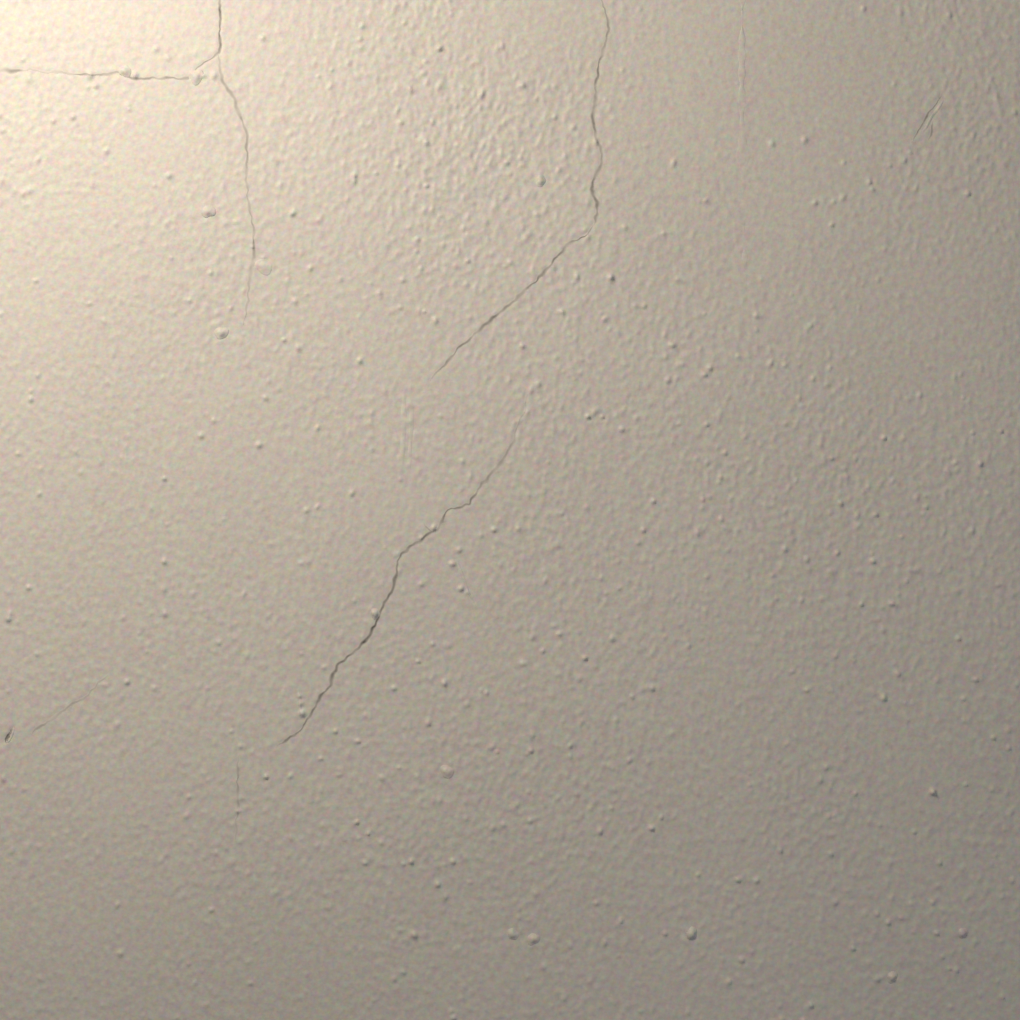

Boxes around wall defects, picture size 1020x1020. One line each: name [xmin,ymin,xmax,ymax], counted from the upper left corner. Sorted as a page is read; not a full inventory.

crack [0,0,256,325]
crack [430,0,611,381]
crack [275,393,527,748]